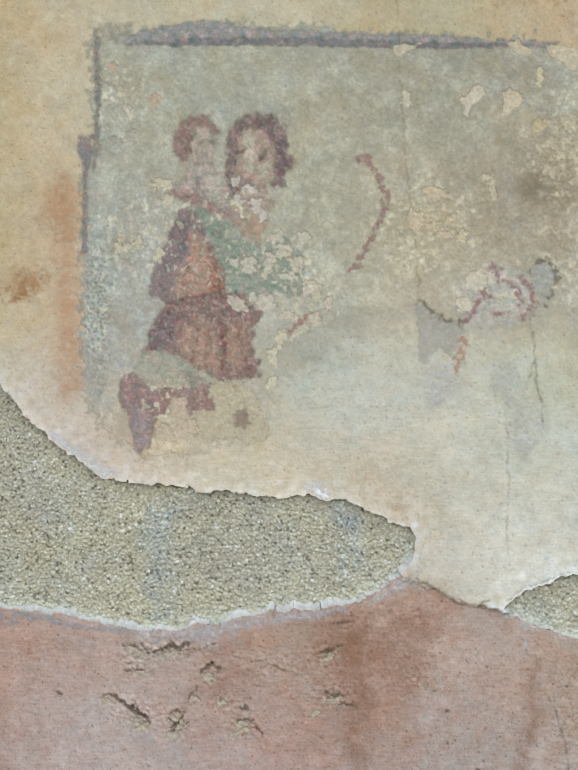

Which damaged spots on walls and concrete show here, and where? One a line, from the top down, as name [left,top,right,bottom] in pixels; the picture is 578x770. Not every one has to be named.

peeling [394,42,422,57]
peeling [459,85,485,115]
peeling [501,88,522,116]
peeling [148,178,174,206]
peeling [231,175,267,223]
peeling [229,229,321,295]
peeling [419,268,488,323]
peeling [227,291,333,389]
spalling [0,381,416,662]
spalling [504,574,578,639]
spalling [102,694,150,731]